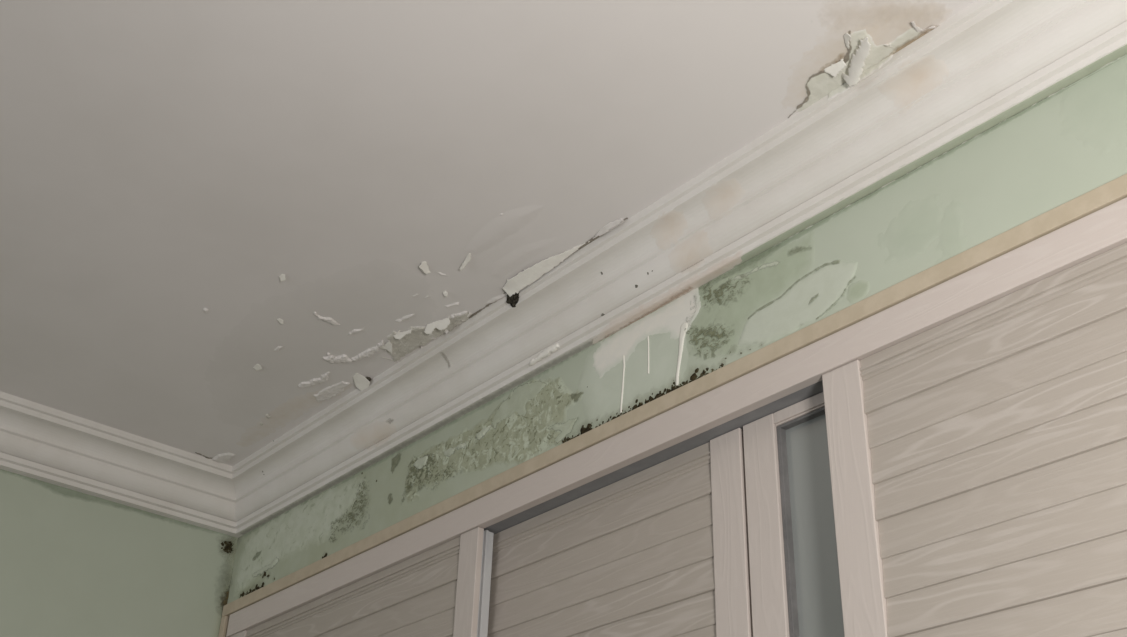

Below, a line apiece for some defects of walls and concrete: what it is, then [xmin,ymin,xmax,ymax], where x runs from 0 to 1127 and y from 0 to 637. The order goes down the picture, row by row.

peeling [788,21,936,118]
peeling [380,218,628,362]
damp [562,232,816,443]
flaking render [388,343,583,504]
damp [221,541,234,553]
damp [222,571,275,606]
peeling [233,472,377,597]